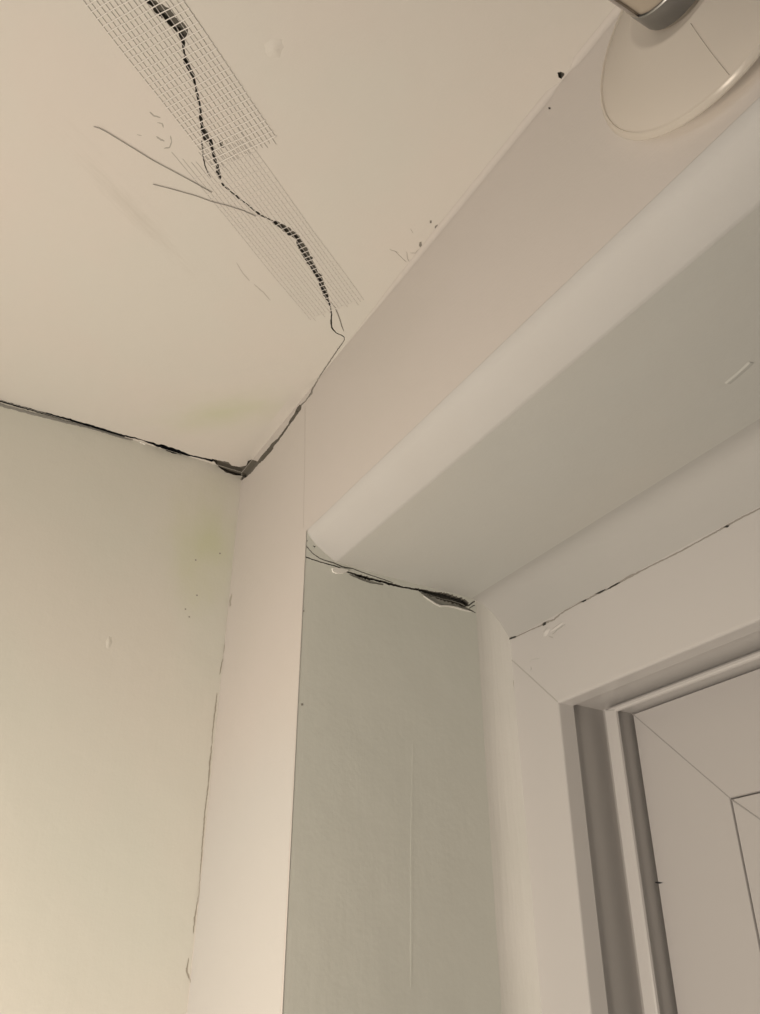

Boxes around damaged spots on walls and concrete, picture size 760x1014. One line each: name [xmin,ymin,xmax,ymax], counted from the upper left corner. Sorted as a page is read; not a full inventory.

crack [0,0,345,480]
crack [306,545,476,613]
crack [509,508,760,640]